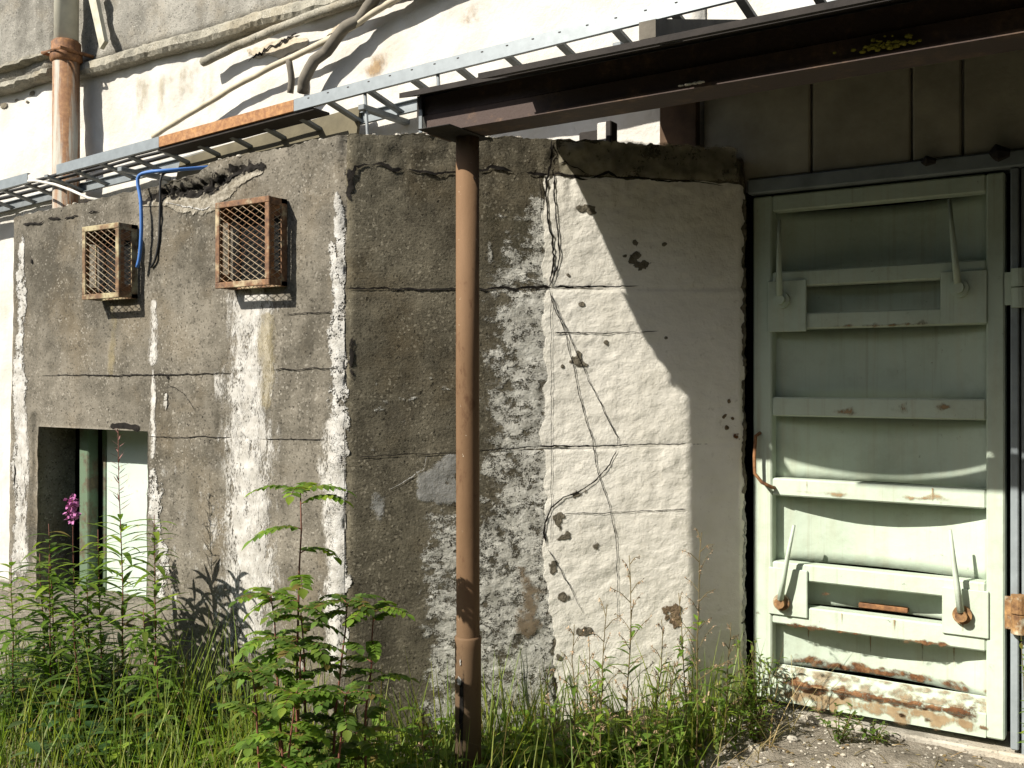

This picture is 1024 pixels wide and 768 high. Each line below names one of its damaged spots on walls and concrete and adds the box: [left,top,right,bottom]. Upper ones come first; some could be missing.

spalling [138,159,265,216]
leakage [211,288,279,667]
leakage [317,191,352,673]
peeling [417,454,462,737]
crack [348,141,722,617]
peeling [480,141,747,733]